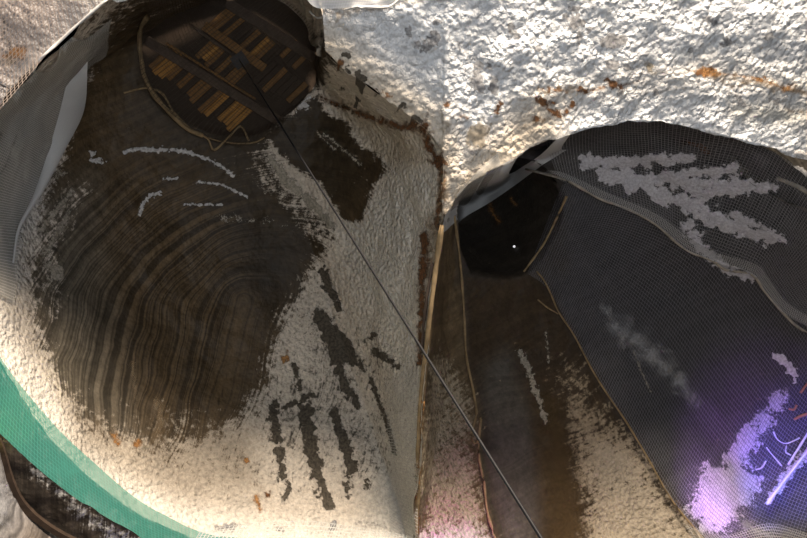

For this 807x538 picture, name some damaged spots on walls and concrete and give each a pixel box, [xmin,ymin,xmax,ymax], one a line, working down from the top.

corrosion [695,66,721,77]
corrosion [577,77,628,94]
corrosion [535,86,575,118]